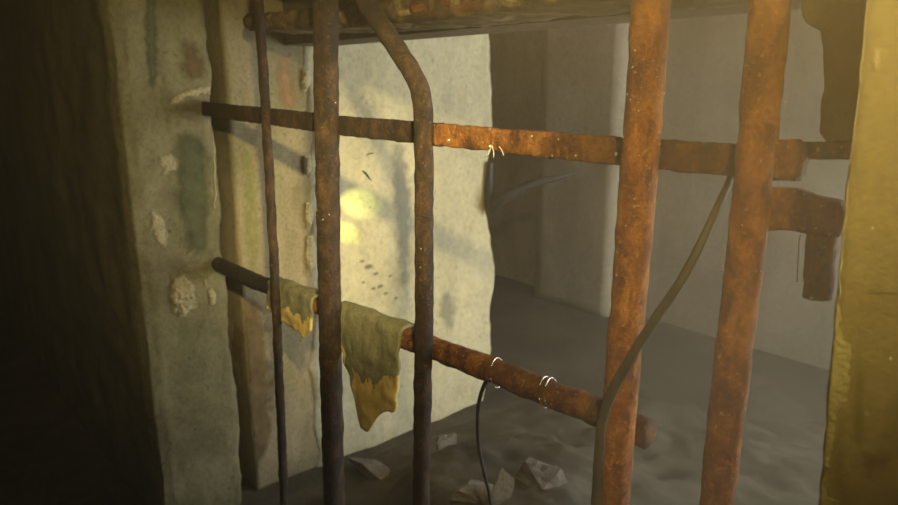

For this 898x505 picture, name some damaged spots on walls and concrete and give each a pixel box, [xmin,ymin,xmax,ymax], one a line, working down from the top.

water stain [146,0,157,86]
spalling [171,62,212,120]
flaking render [171,276,216,317]